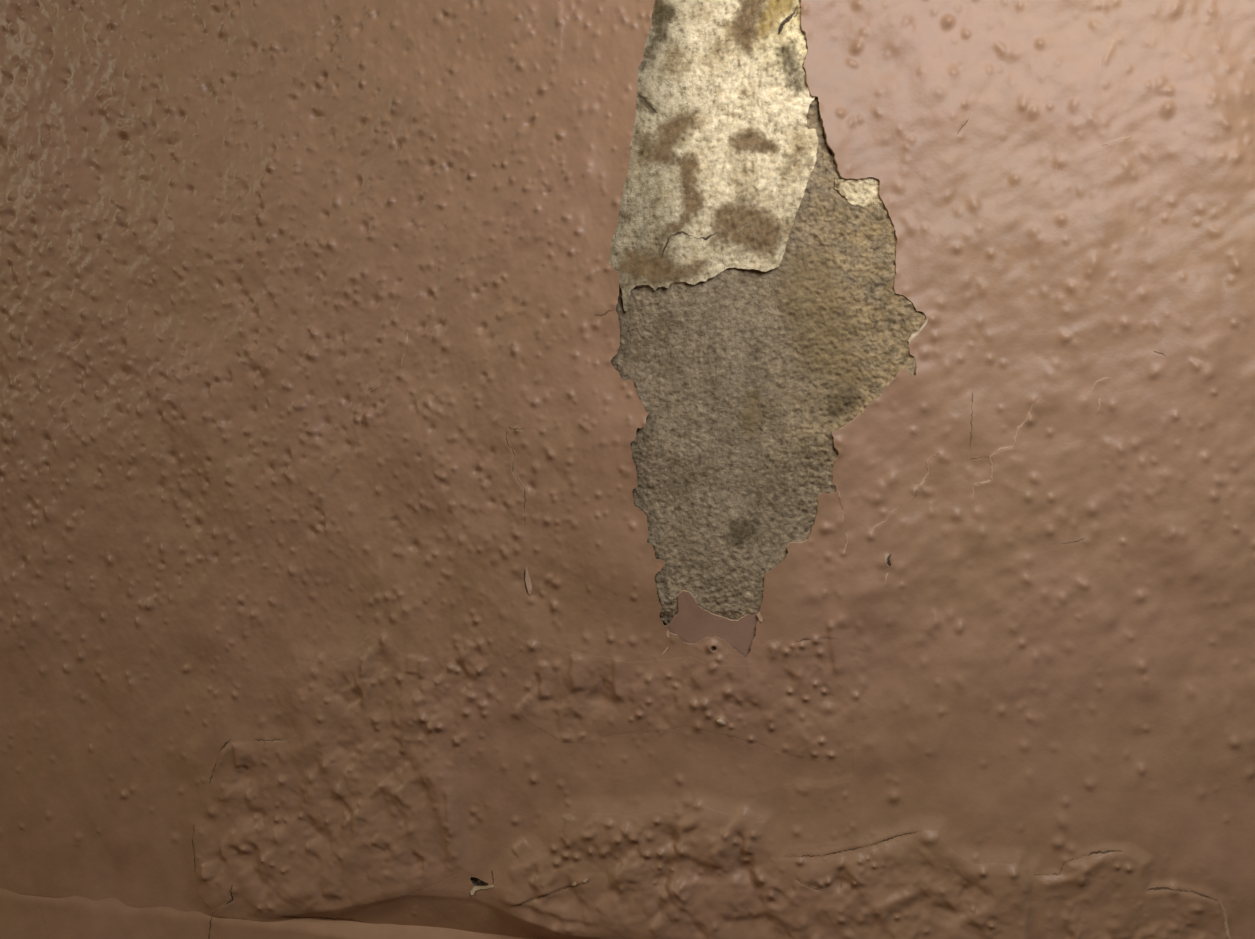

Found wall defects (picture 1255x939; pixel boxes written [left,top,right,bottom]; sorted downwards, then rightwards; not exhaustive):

peeling [609,0,928,657]
crack [789,831,919,857]
crack [1034,850,1122,875]
crack [1147,887,1231,939]